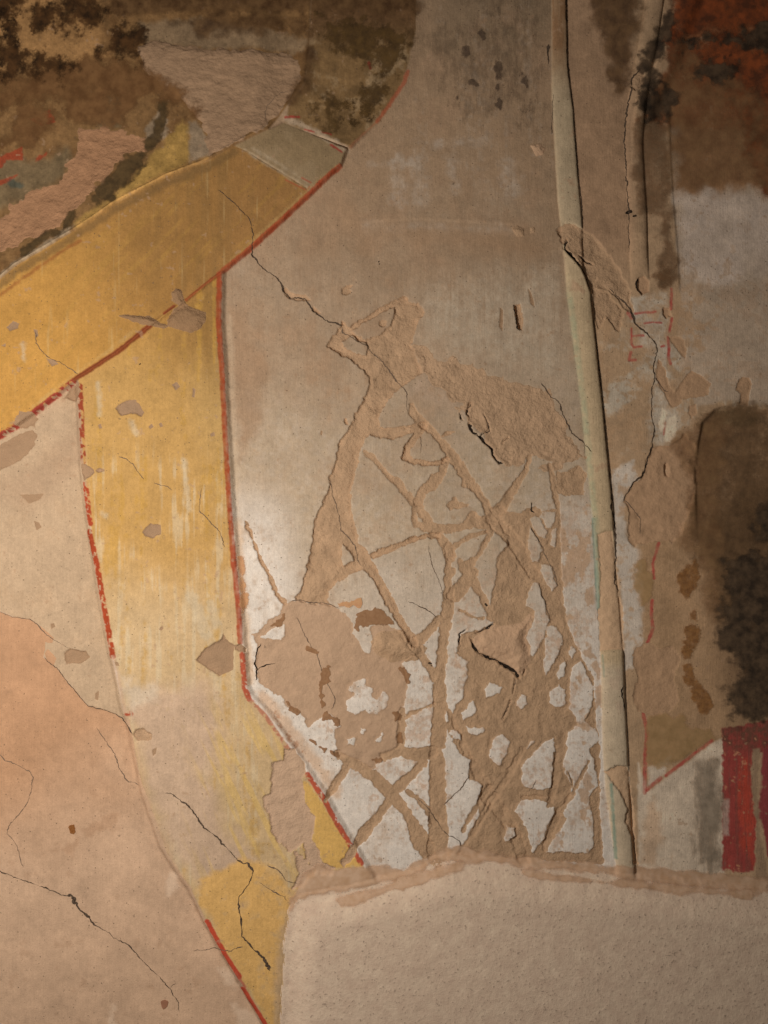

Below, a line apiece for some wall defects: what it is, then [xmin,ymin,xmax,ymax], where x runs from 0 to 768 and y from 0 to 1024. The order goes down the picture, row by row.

damp [20,211,75,256]
spalling [0,126,147,252]
damp [0,0,200,205]
crack [220,191,408,411]
damp [313,11,414,132]
spalling [499,289,535,331]
crack [541,0,668,591]
damp [636,10,768,123]
spalling [196,296,639,890]
damp [677,403,768,723]
crack [0,755,179,1010]
crack [168,793,297,971]